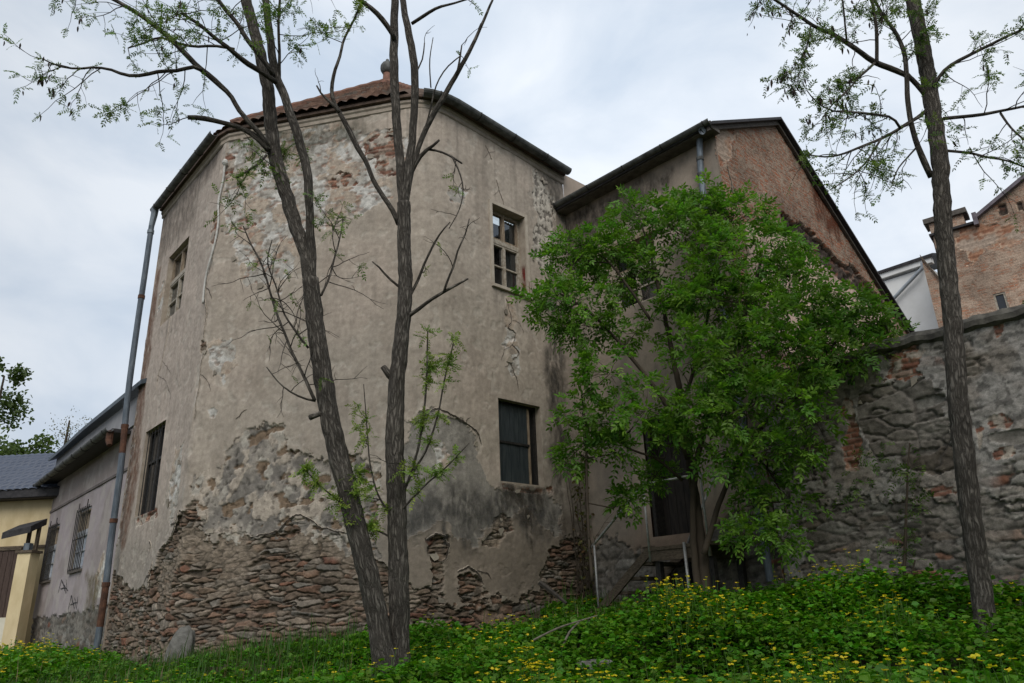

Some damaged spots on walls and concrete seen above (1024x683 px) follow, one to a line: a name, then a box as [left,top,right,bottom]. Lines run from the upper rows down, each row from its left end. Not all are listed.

peeling [210,135,299,294]
peeling [279,121,408,232]
peeling [532,168,556,272]
crack [501,299,524,391]
spalling [30,421,368,666]
peeling [349,453,389,618]
peeling [404,407,687,631]
spalling [711,347,972,609]
spalling [980,492,1024,608]